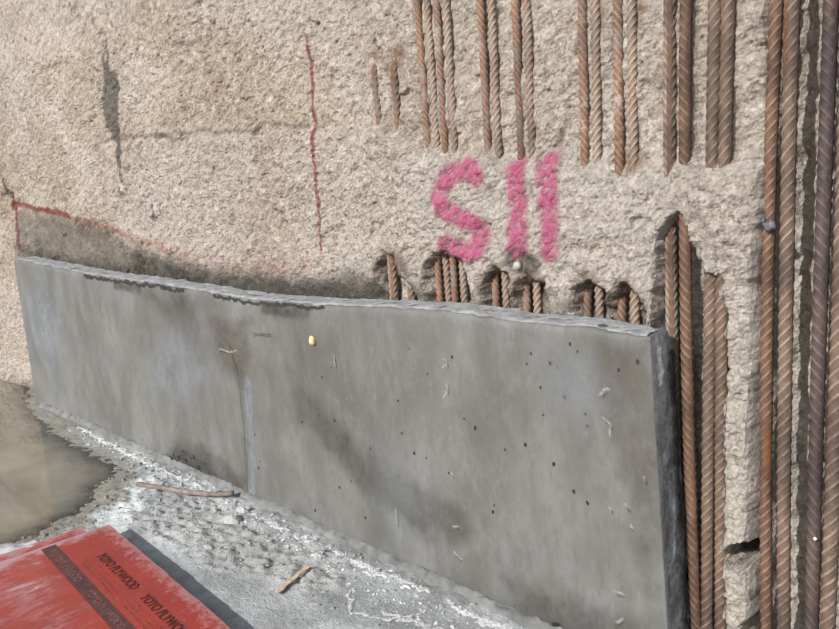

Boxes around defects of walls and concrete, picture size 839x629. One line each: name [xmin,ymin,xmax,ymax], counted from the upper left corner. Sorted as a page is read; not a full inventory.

leakage [101,45,121,171]
spalling [376,253,420,301]
spalling [425,252,550,314]
spalling [574,211,691,629]
spalling [689,236,715,586]
spalling [713,358,737,629]